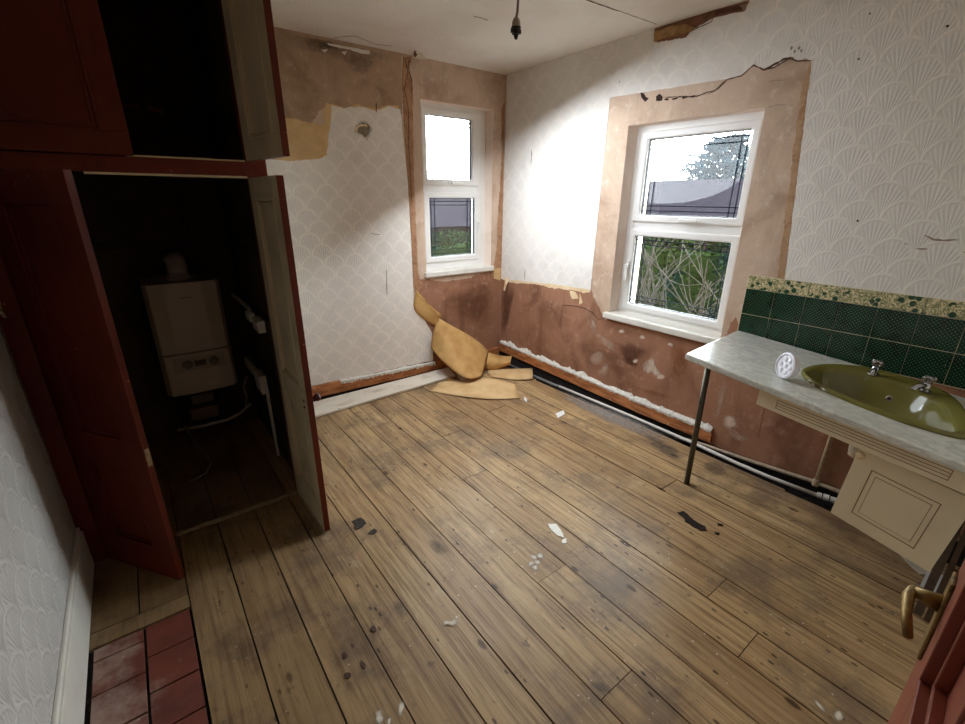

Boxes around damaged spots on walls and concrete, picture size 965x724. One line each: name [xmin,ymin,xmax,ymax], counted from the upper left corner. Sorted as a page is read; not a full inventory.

peeling [321,43,370,55]
flaking render [654,1,749,42]
flaking render [641,93,696,102]
flaking render [402,51,426,293]
flaking render [492,104,509,291]
flaking render [777,63,811,279]
flaking render [500,340,713,433]
damp [624,347,665,379]